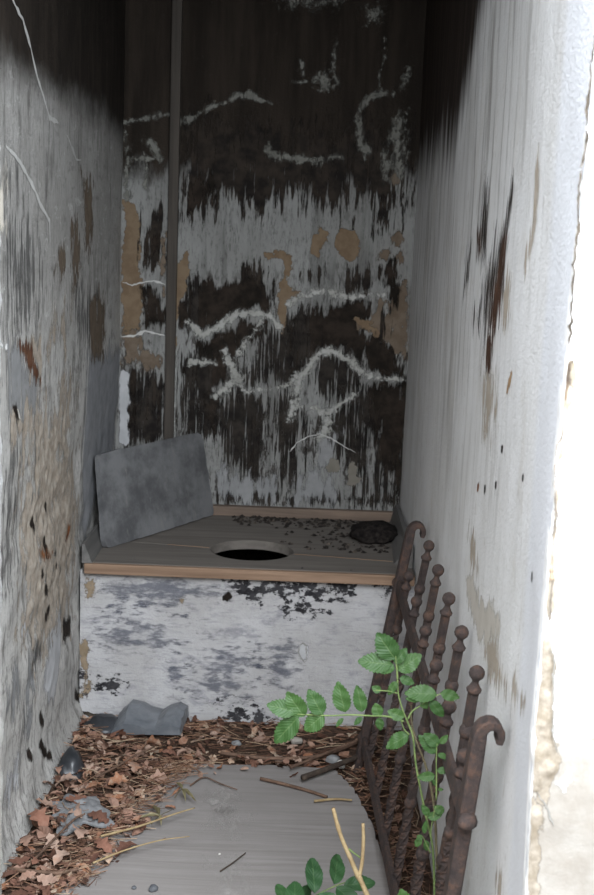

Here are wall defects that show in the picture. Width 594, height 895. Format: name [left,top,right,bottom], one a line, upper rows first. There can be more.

peeling [120,199,163,373]
peeling [176,251,190,321]
peeling [263,250,301,334]
peeling [310,227,361,262]
peeling [353,279,409,360]
peeling [378,231,404,264]
damp [463,169,490,296]
peeling [325,458,362,486]
damp [77,578,357,698]
damp [193,638,298,724]
peeling [467,574,526,715]
peeling [528,359,594,895]